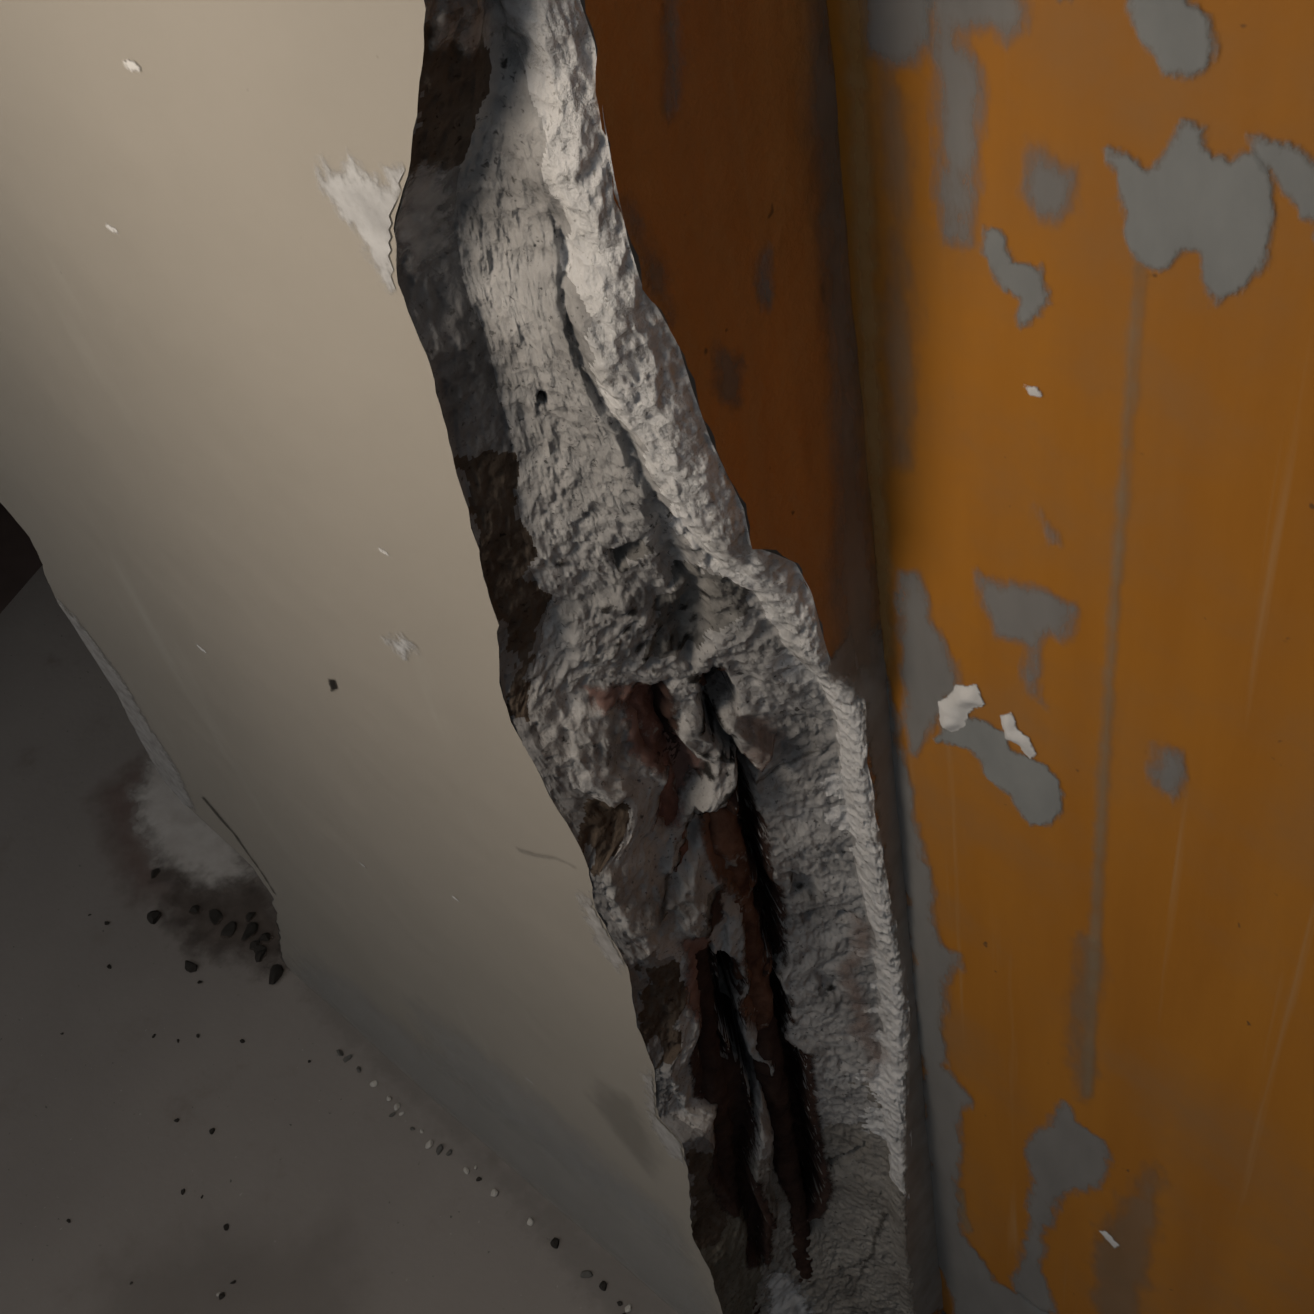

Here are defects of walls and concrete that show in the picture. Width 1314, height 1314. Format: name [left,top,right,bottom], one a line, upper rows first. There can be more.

peeling [1126,0,1217,78]
peeling [1105,119,1314,303]
spalling [316,0,1109,1314]
rust [583,682,701,828]
rust [680,747,833,1270]